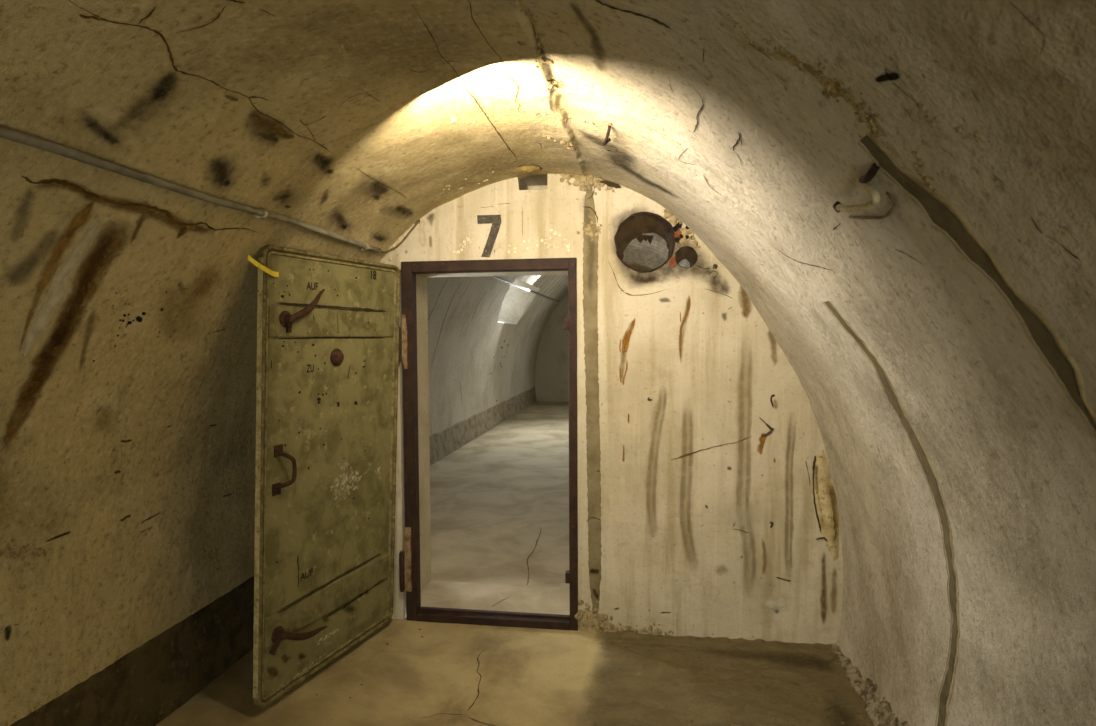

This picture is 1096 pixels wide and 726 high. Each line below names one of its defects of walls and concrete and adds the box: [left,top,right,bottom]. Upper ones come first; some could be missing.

crack [69,0,542,156]
crack [22,176,255,238]
rust [4,203,146,443]
rust [619,319,635,384]
rust [679,298,690,355]
damp [741,288,750,317]
rust [759,418,774,454]
spalling [575,600,673,636]
crack [422,650,495,726]